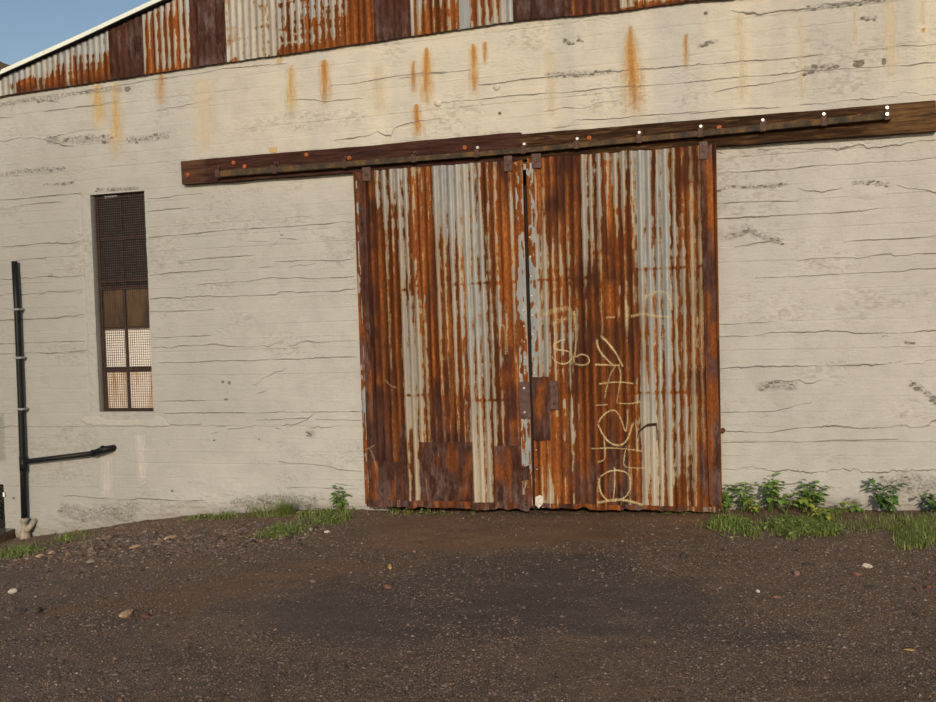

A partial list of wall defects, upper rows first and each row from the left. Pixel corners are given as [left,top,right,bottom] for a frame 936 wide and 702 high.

rust [321,60,329,93]
rust [412,48,431,91]
crack [293,43,936,141]
rust [625,28,639,96]
crack [719,320,936,337]
crack [720,359,936,443]
crack [722,465,936,487]